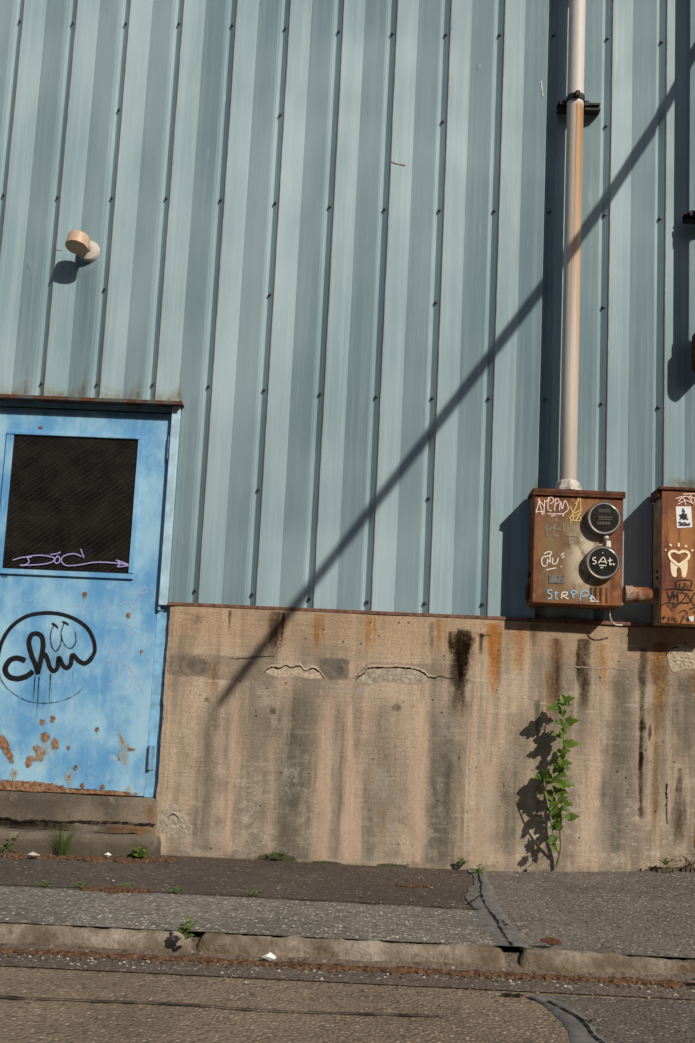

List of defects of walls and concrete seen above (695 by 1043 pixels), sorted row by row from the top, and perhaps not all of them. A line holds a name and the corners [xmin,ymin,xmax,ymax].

spalling [264,663,324,680]
spalling [356,664,437,685]
damp [449,631,483,702]
corrosion [0,715,138,796]